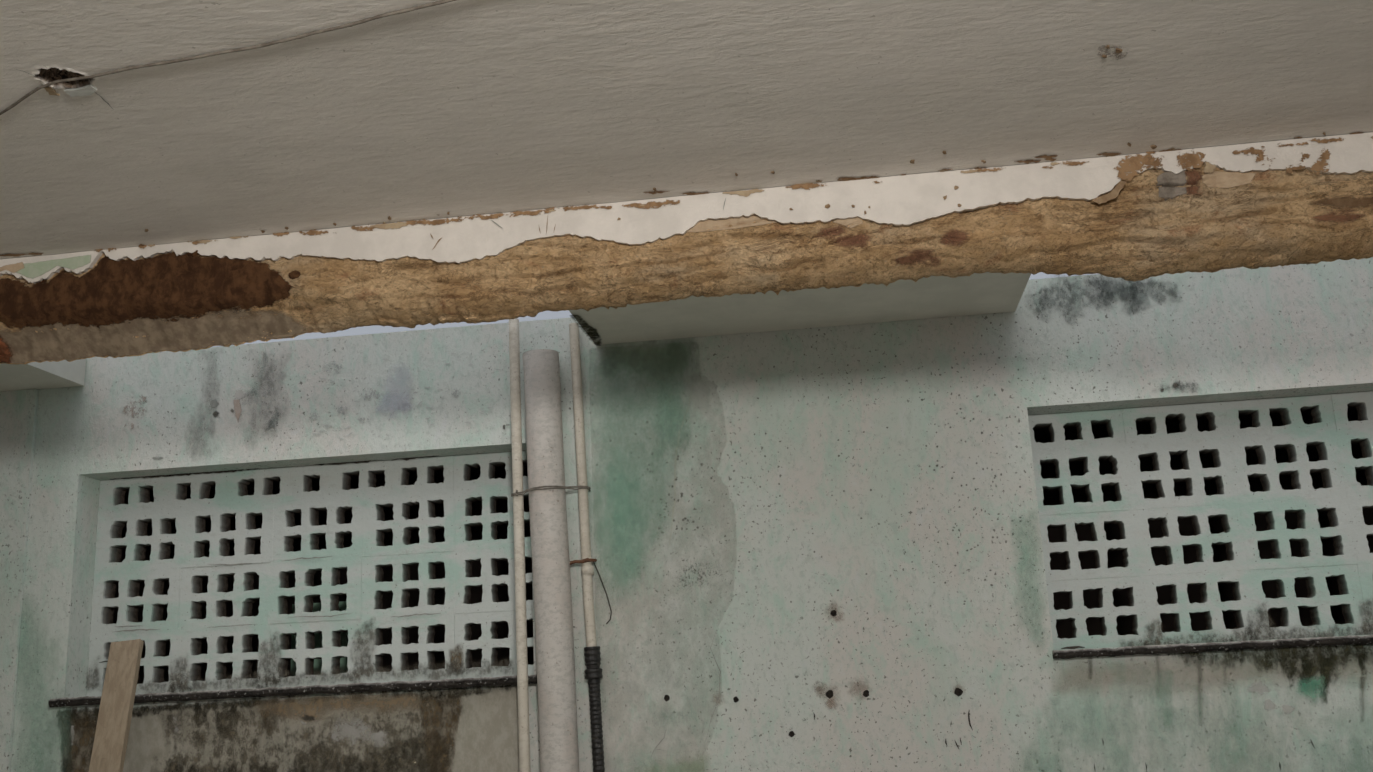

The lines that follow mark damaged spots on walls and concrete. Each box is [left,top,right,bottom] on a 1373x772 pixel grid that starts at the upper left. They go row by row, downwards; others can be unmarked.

spalling [0,132,1373,364]
damp [1030,275,1177,321]
damp [56,707,99,772]
damp [123,623,519,772]